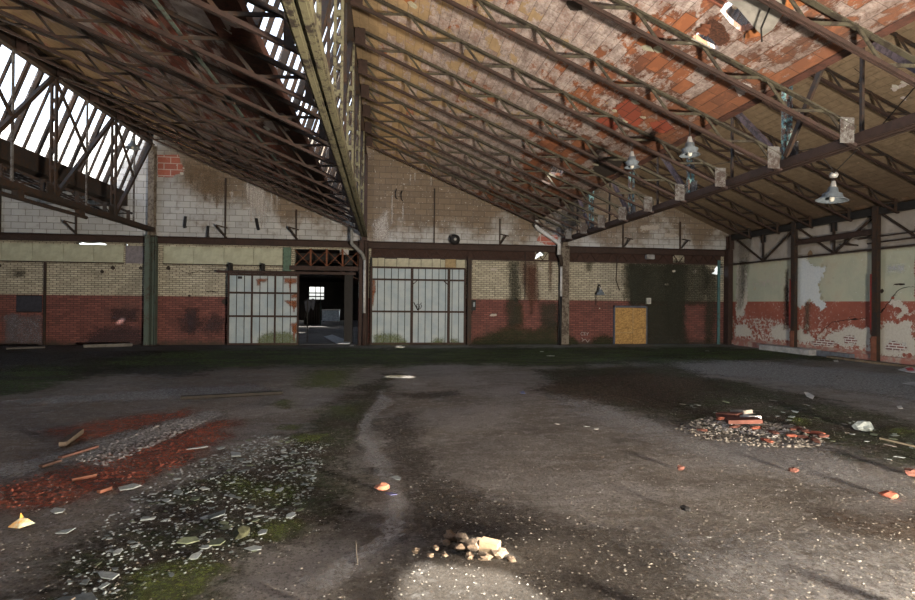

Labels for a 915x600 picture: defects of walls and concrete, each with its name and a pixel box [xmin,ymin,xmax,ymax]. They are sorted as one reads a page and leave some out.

peeling [641,45,663,53]
spalling [696,18,729,46]
damp [243,182,278,224]
peeling [797,250,827,311]
peeling [734,262,915,358]